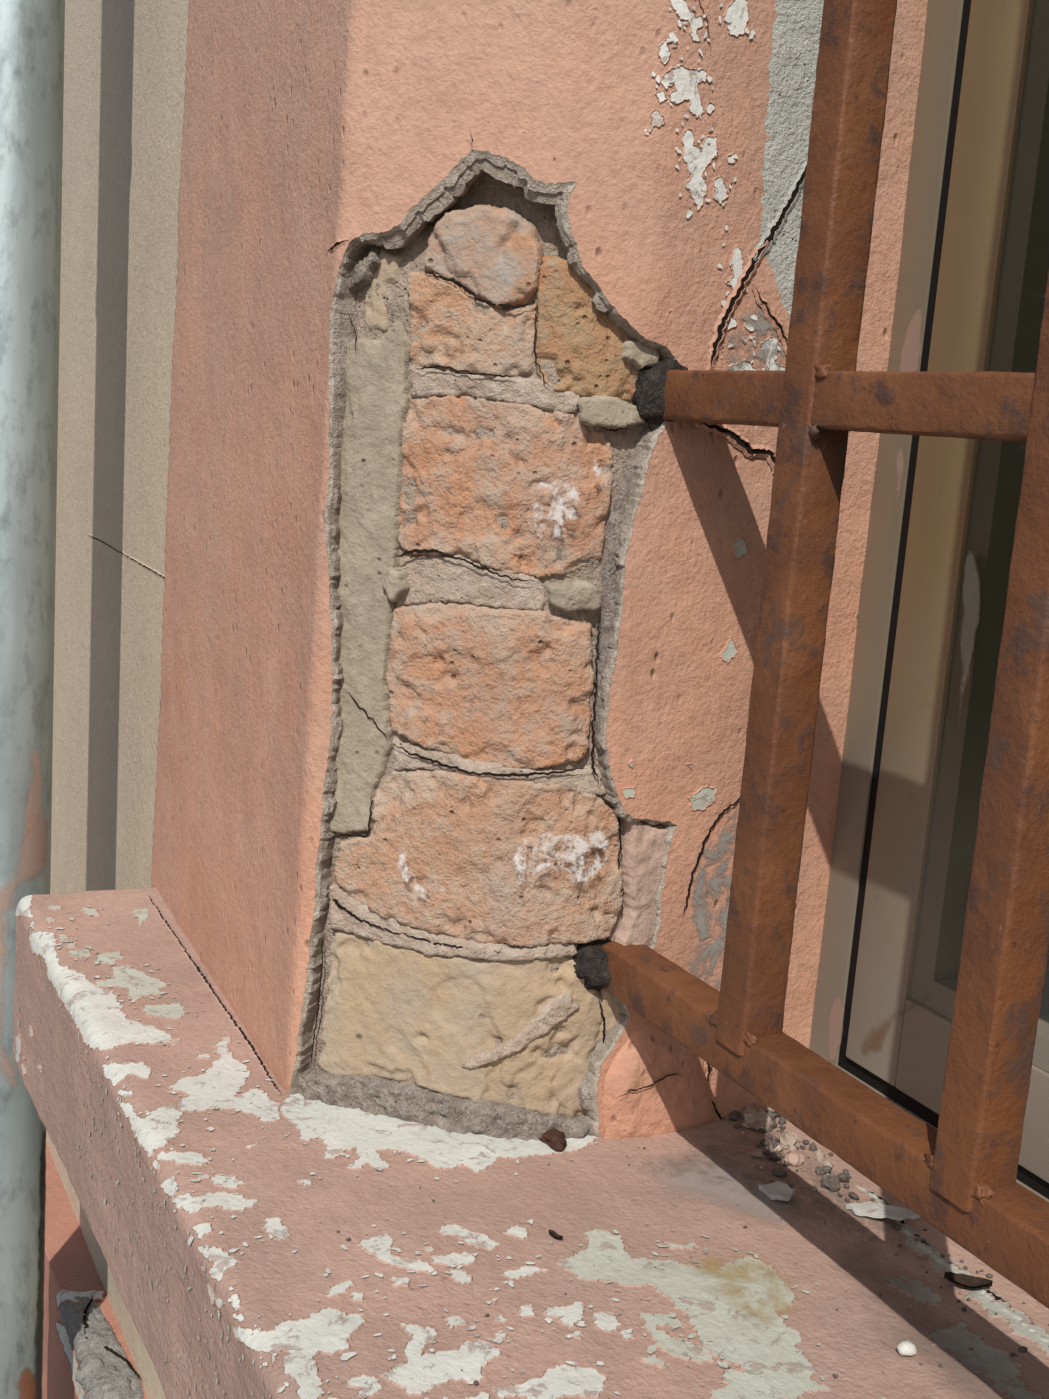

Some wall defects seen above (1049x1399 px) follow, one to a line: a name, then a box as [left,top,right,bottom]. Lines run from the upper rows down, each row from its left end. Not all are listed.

peeling [644,0,755,218]
flaking render [760,0,824,317]
crack [706,156,808,370]
crack [695,422,776,474]
spalling [15,150,833,1399]
crack [682,797,740,918]
crack [856,1185,1049,1346]
peeling [877,1224,1049,1356]
peeling [927,1321,1044,1399]